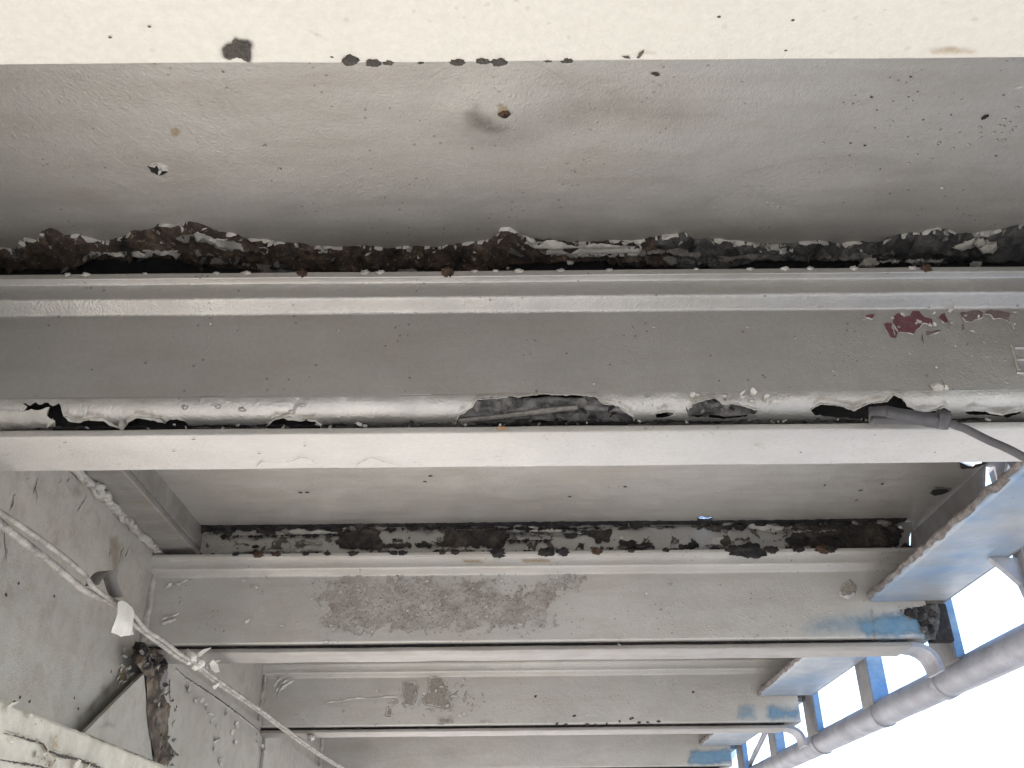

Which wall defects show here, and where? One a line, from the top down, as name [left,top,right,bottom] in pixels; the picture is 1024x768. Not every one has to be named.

rust [222,39,251,73]
peeling [148,162,169,176]
rust [80,232,367,278]
rust [415,258,502,277]
rust [556,248,701,269]
rust [717,245,998,272]
peeling [862,304,1019,344]
peeling [0,402,191,431]
spalling [264,402,320,429]
spalling [803,390,914,424]
spalling [966,411,1021,421]
rust [206,517,904,562]